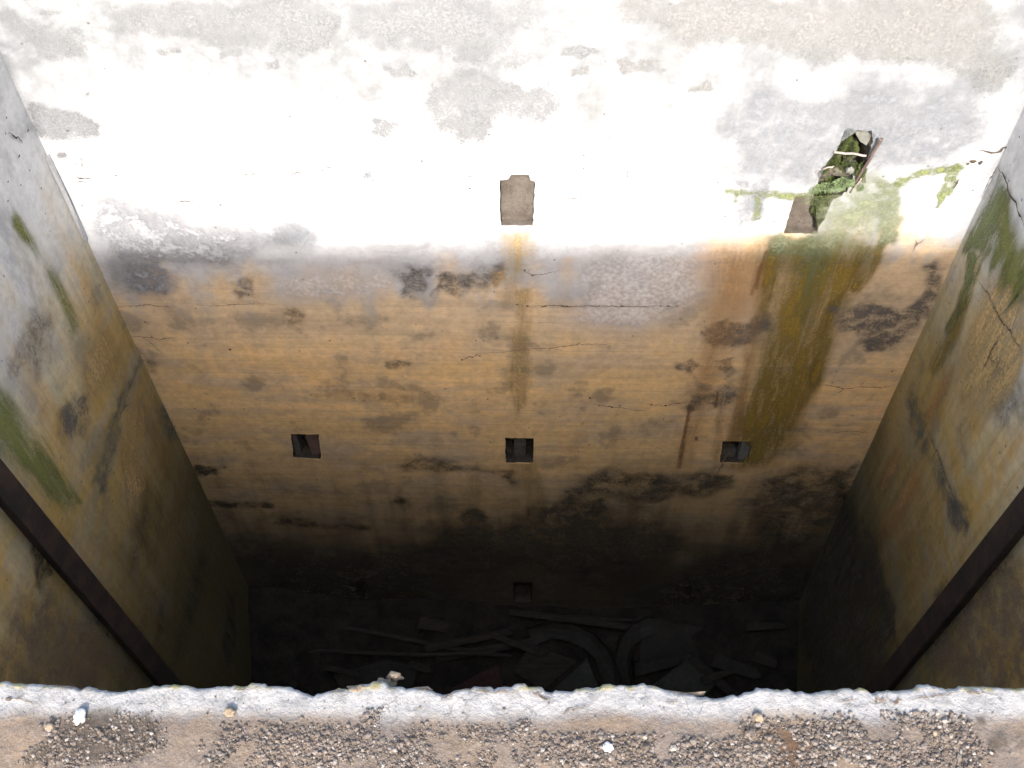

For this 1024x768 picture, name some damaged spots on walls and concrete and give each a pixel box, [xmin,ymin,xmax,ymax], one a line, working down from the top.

spalling [809,128,883,229]
crack [953,147,1024,225]
damp [403,265,500,294]
crack [461,340,625,361]
crack [516,302,682,310]
damp [702,317,771,346]
damp [830,262,940,351]
crack [979,283,1022,370]
damp [432,470,730,582]